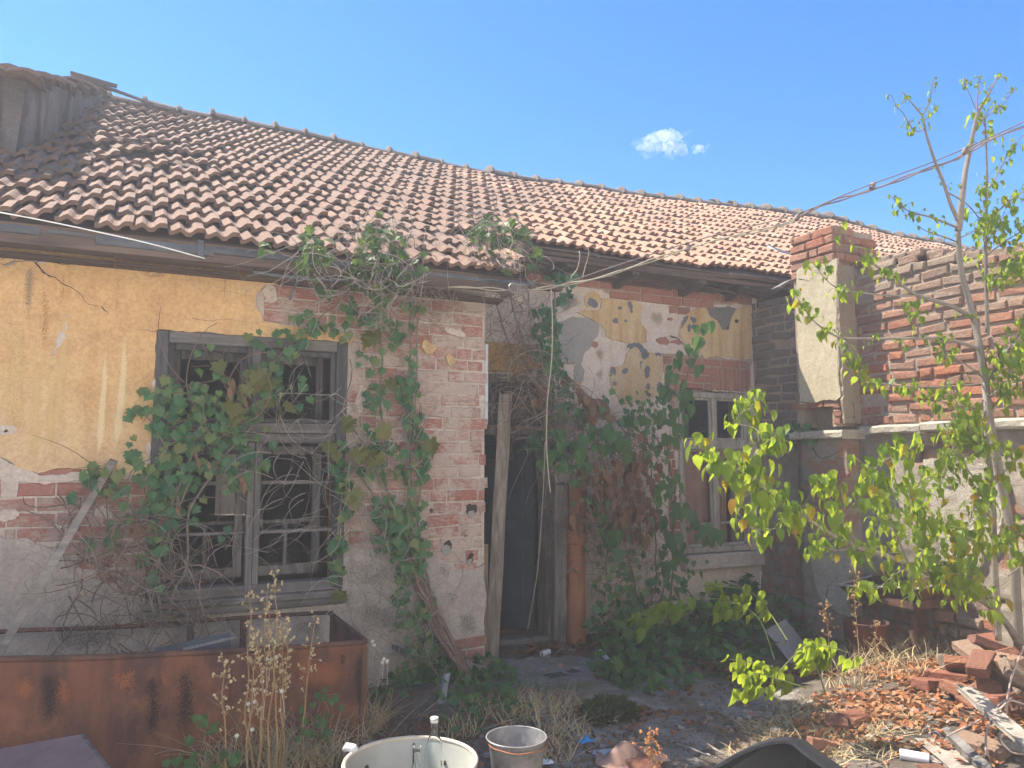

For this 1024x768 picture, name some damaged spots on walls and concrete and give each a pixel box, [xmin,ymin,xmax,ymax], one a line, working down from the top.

crack [0,258,107,312]
peeling [528,273,752,409]
flaking render [0,442,151,595]